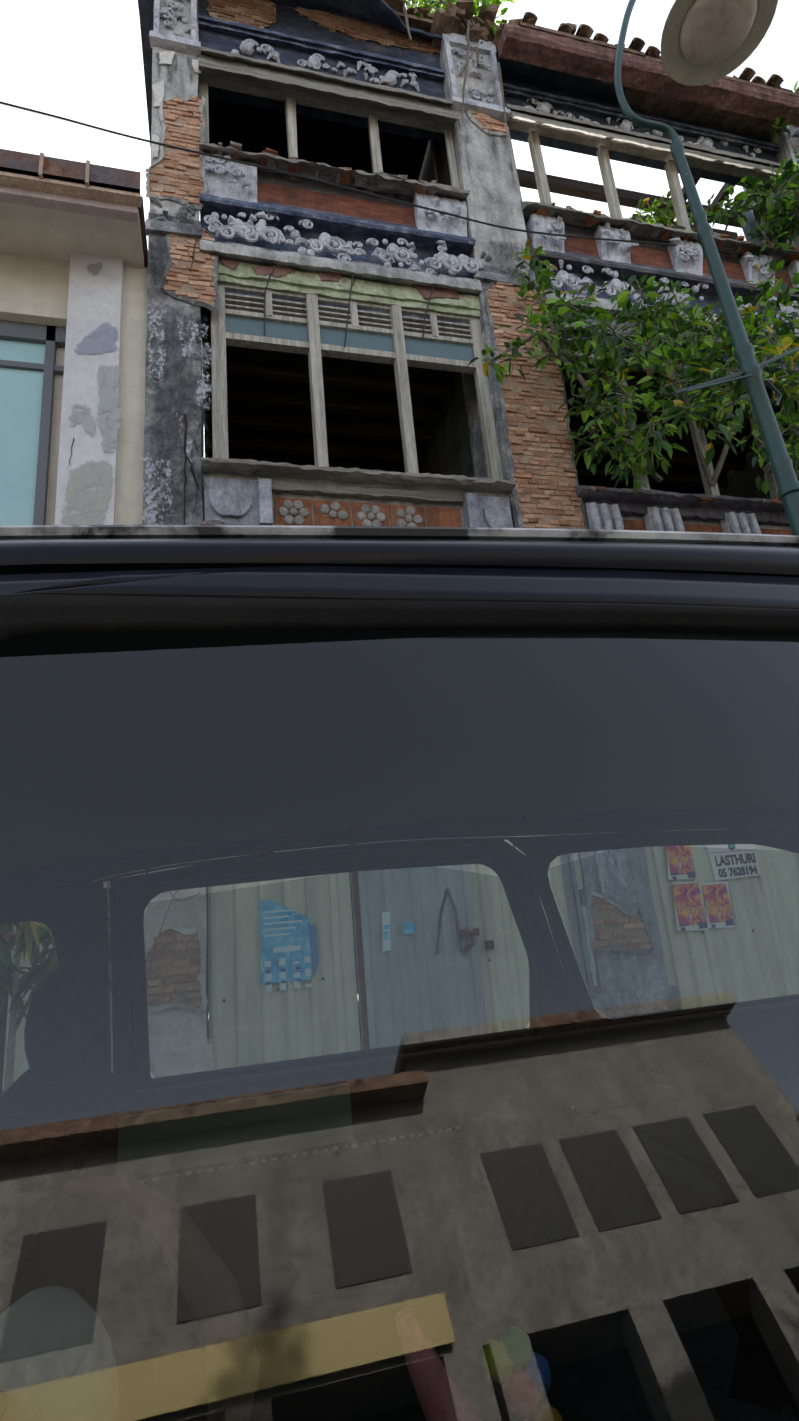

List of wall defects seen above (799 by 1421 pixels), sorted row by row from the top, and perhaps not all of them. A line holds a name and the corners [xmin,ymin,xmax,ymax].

flaking render [207,0,440,55]
flaking render [145,51,208,209]
flaking render [161,228,295,312]
peeling [316,272,342,282]
peeling [412,285,459,299]
peeling [61,322,121,525]
leakage [142,308,213,525]
flaking render [484,282,587,529]
flaking render [145,923,208,1013]
peeling [572,849,629,987]